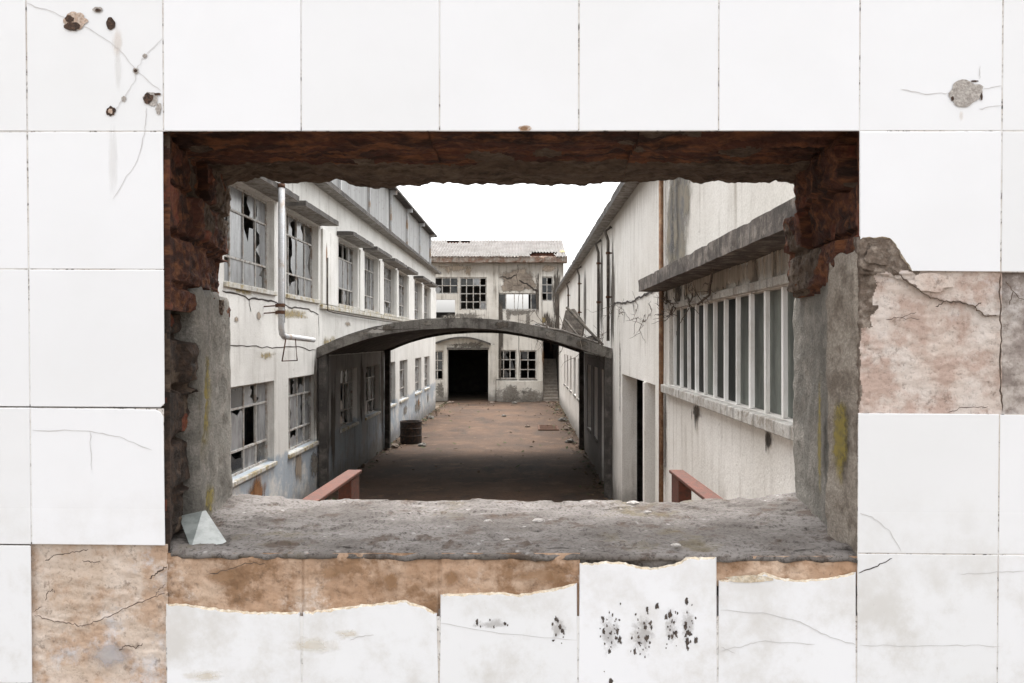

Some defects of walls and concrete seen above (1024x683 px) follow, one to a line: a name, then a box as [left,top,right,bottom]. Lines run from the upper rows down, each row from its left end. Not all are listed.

spalling [63,7,115,31]
crack [27,3,162,197]
spalling [142,92,161,114]
spalling [949,79,983,107]
peeling [853,237,1024,414]
crack [35,430,151,469]
crack [859,514,901,573]
peeling [30,544,580,683]
water stain [600,598,698,658]